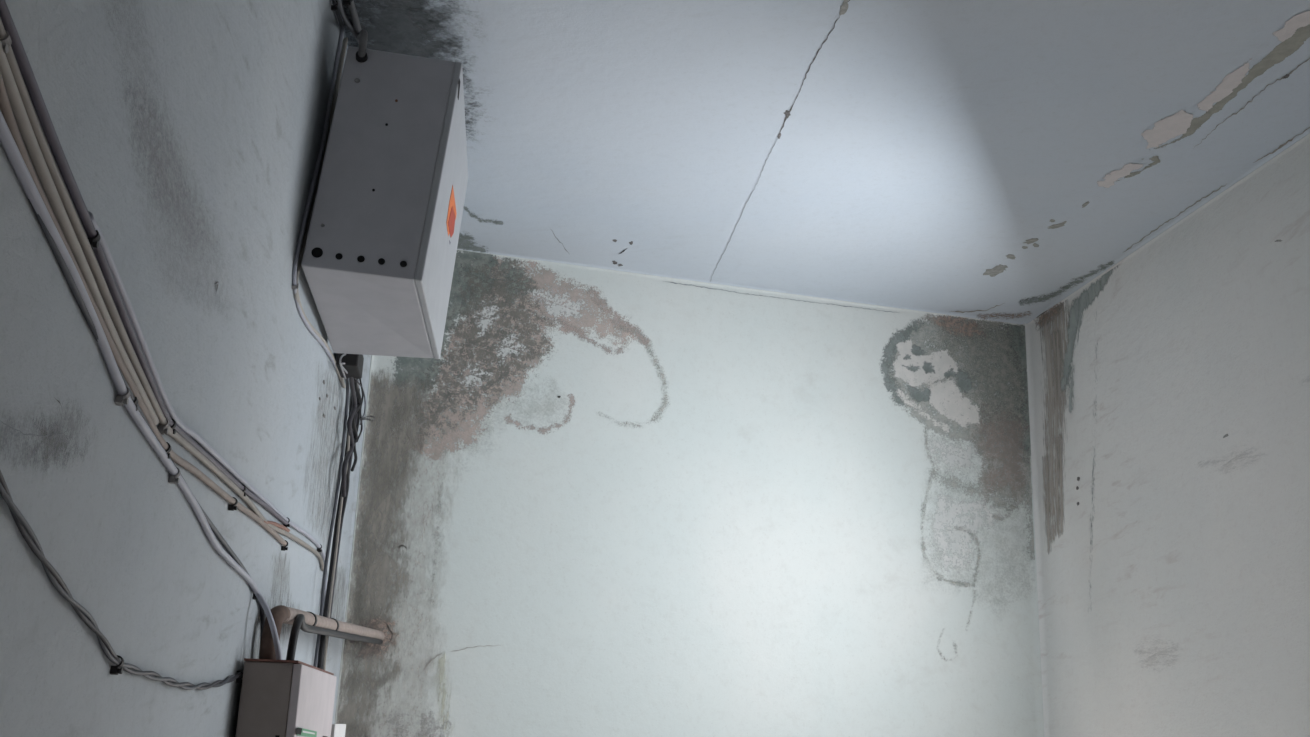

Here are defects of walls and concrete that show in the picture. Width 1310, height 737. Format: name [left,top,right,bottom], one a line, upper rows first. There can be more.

water stain [343,0,467,84]
crack [663,0,898,313]
peeling [1097,11,1310,188]
peeling [983,219,1067,277]
water stain [332,233,668,737]